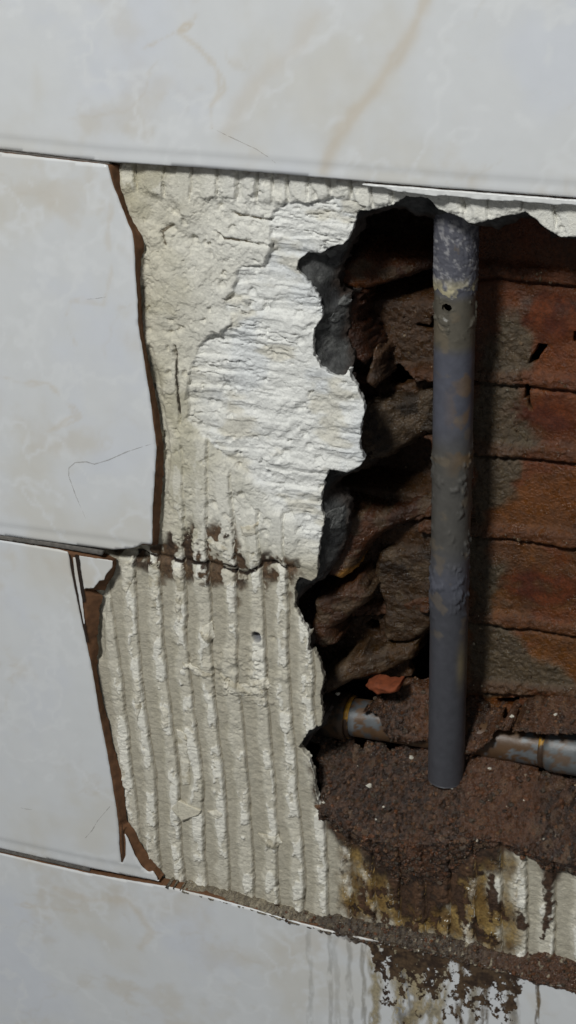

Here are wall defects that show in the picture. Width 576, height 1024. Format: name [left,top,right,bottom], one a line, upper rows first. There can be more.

spalling [311,241,352,360]
peeling [121,555,135,592]
peeling [148,561,160,608]
peeling [173,567,186,623]
peeling [206,540,228,553]
crack [150,553,300,575]
spalling [298,505,346,587]
peeling [182,662,271,697]
peeling [159,707,190,785]
damp [341,844,517,951]
damp [350,937,576,1024]